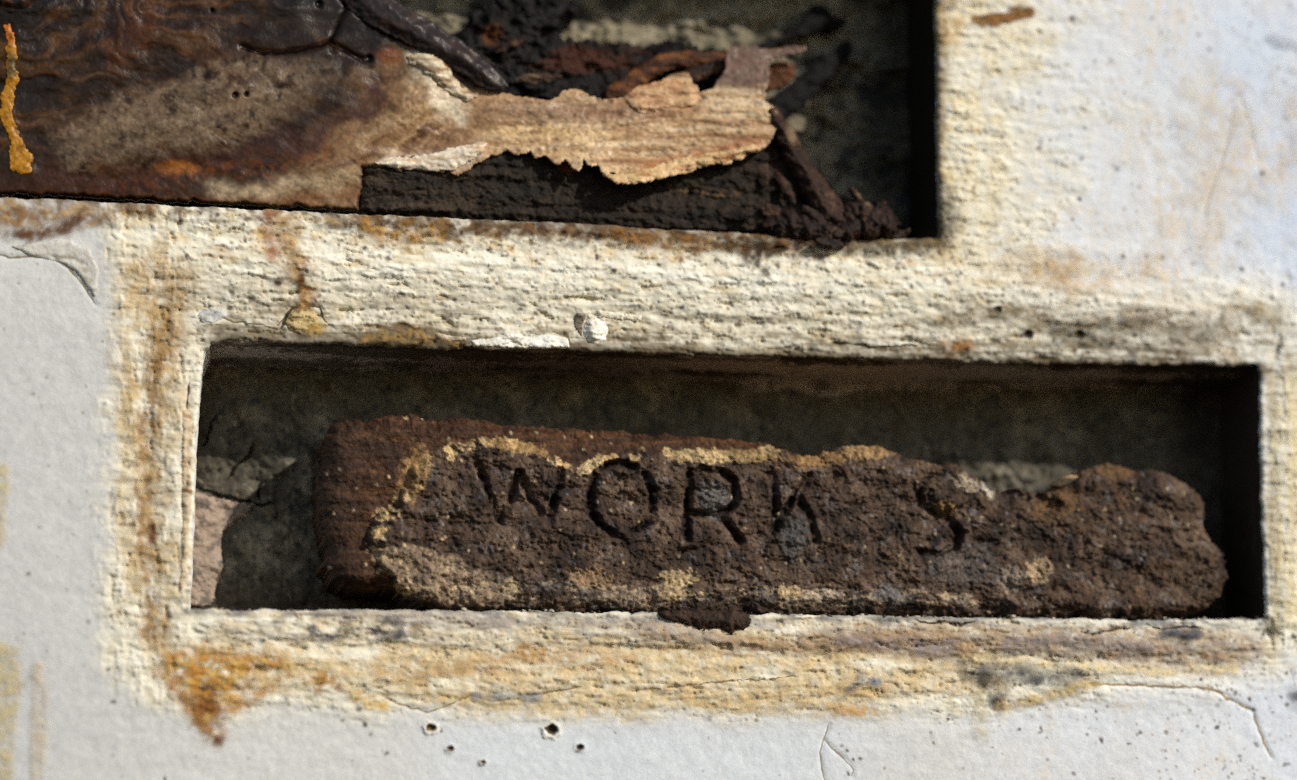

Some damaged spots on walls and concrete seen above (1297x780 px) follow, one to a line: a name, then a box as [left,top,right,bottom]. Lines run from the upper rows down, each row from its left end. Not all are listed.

corrosion [972,4,1035,27]
crack [0,254,95,303]
corrosion [162,645,290,744]
water stain [248,609,1097,716]
water stain [1163,628,1204,640]
crack [1096,683,1272,757]